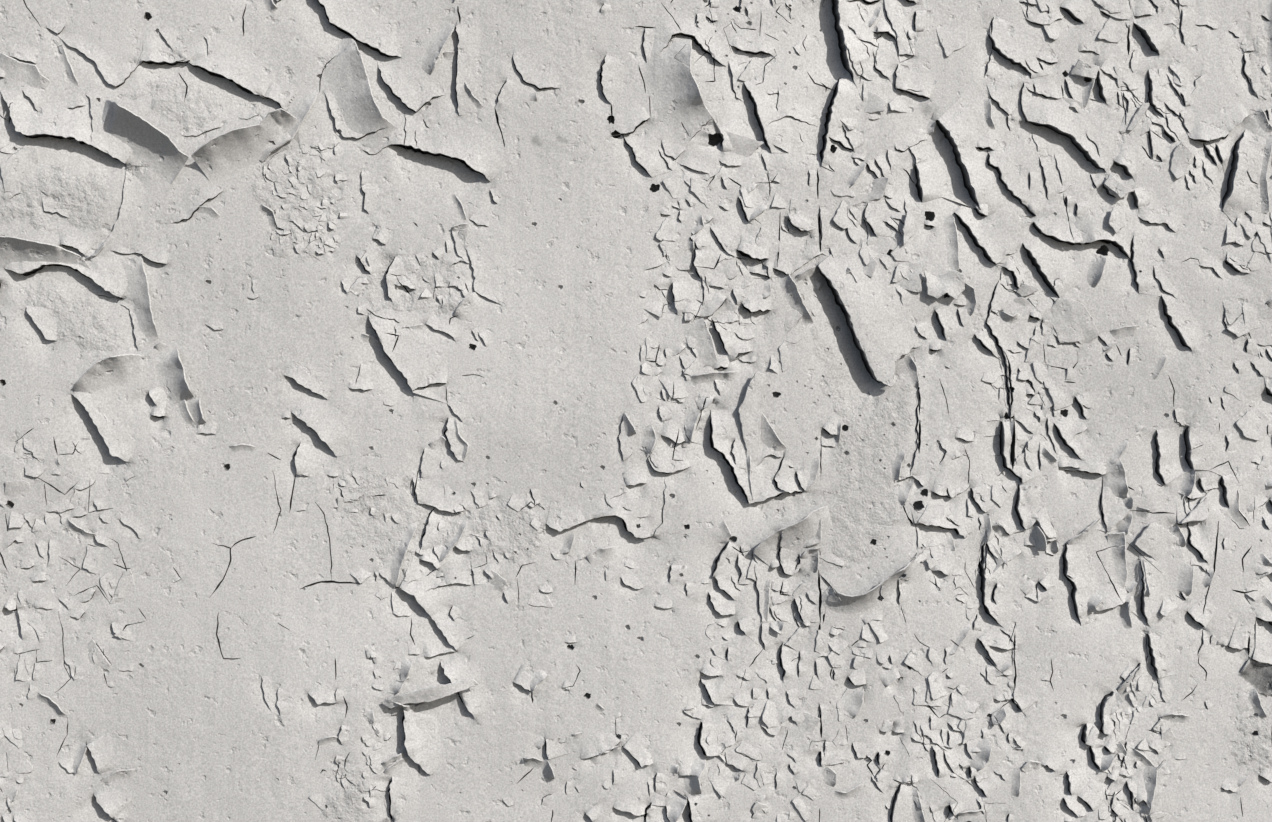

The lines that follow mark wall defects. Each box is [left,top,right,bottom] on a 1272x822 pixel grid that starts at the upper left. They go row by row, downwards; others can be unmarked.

spalling [0,0,560,822]
spalling [272,0,1272,822]
crack [1221,702,1272,816]